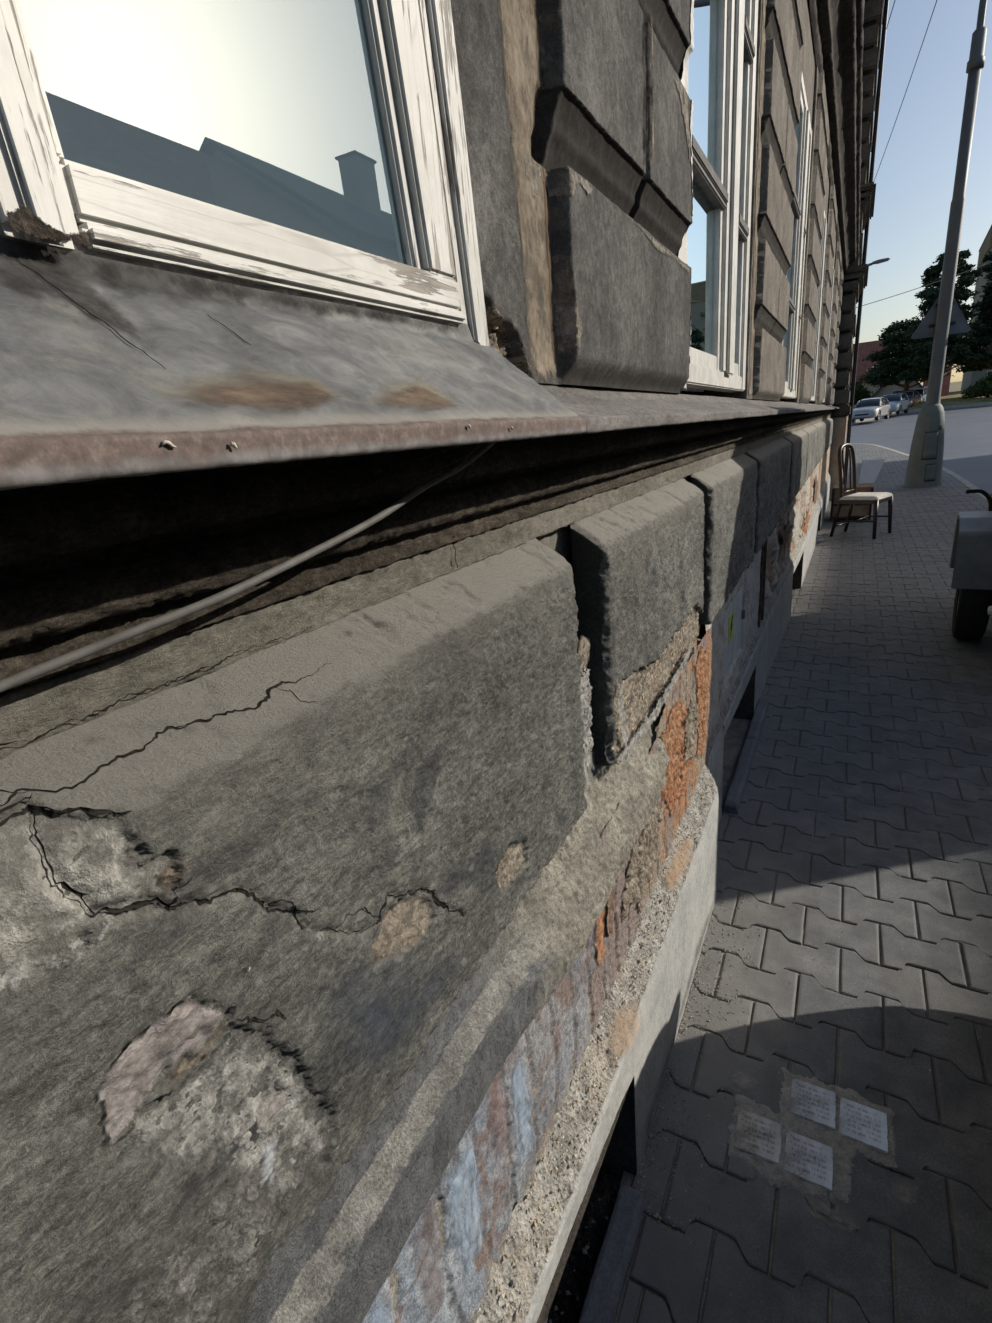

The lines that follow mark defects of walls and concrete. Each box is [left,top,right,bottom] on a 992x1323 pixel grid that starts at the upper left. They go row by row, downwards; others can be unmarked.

corrosion [200,380,330,408]
crack [0,625,313,746]
peeling [578,637,594,782]
flaking render [612,606,703,767]
crack [0,663,464,935]
flaking render [371,899,433,958]
flaking render [495,842,525,889]
flaking render [99,996,341,1323]